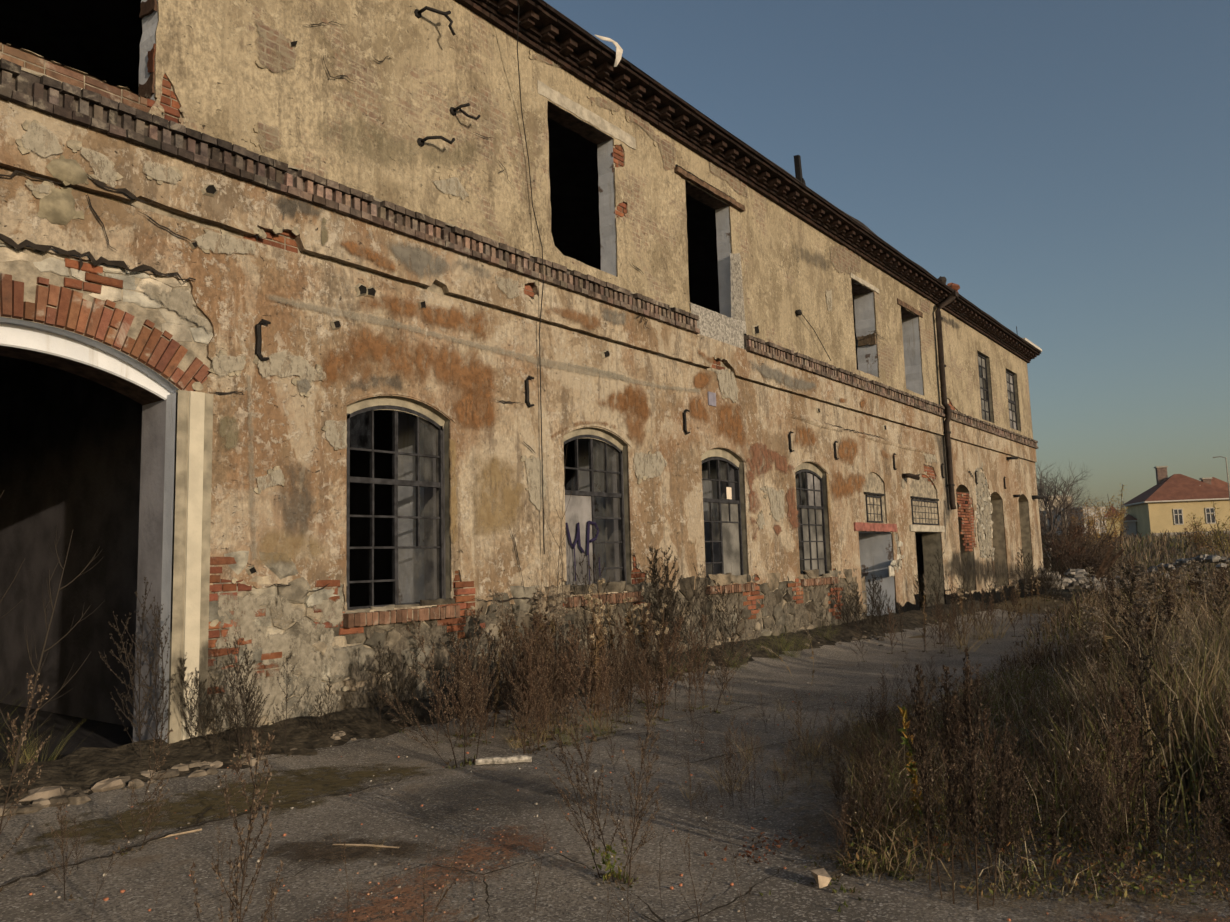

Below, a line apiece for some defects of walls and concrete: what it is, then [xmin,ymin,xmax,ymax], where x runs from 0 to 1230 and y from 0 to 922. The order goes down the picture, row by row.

flaking render [139,0,157,19]
flaking render [0,43,185,126]
crack [0,170,196,283]
peeling [189,225,300,254]
flaking render [0,238,327,397]
flaking render [207,551,364,734]
flaking render [436,570,485,638]